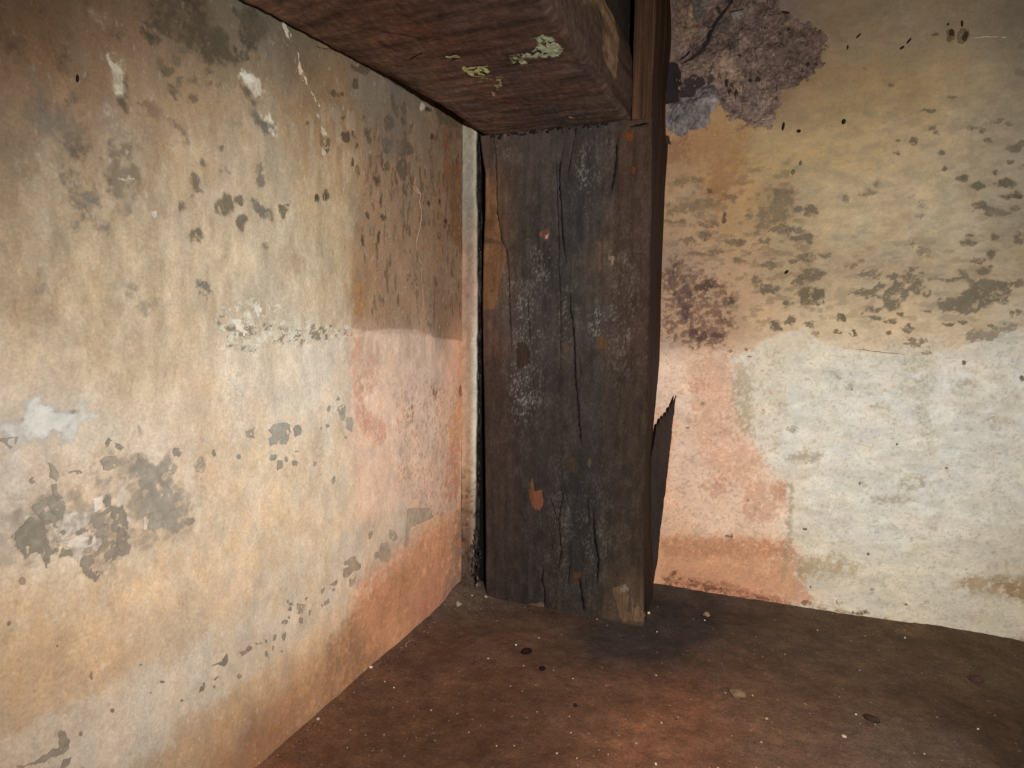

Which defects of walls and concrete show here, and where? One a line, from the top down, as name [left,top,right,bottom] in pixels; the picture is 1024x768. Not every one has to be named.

water stain [102,53,127,130]
water stain [144,0,297,231]
spalling [666,0,828,132]
water stain [956,171,1022,216]
peeling [214,296,354,353]
crack [474,98,589,440]
water stain [662,178,830,349]
water stain [848,234,1024,359]
peeling [0,395,98,450]
peeling [0,438,195,582]